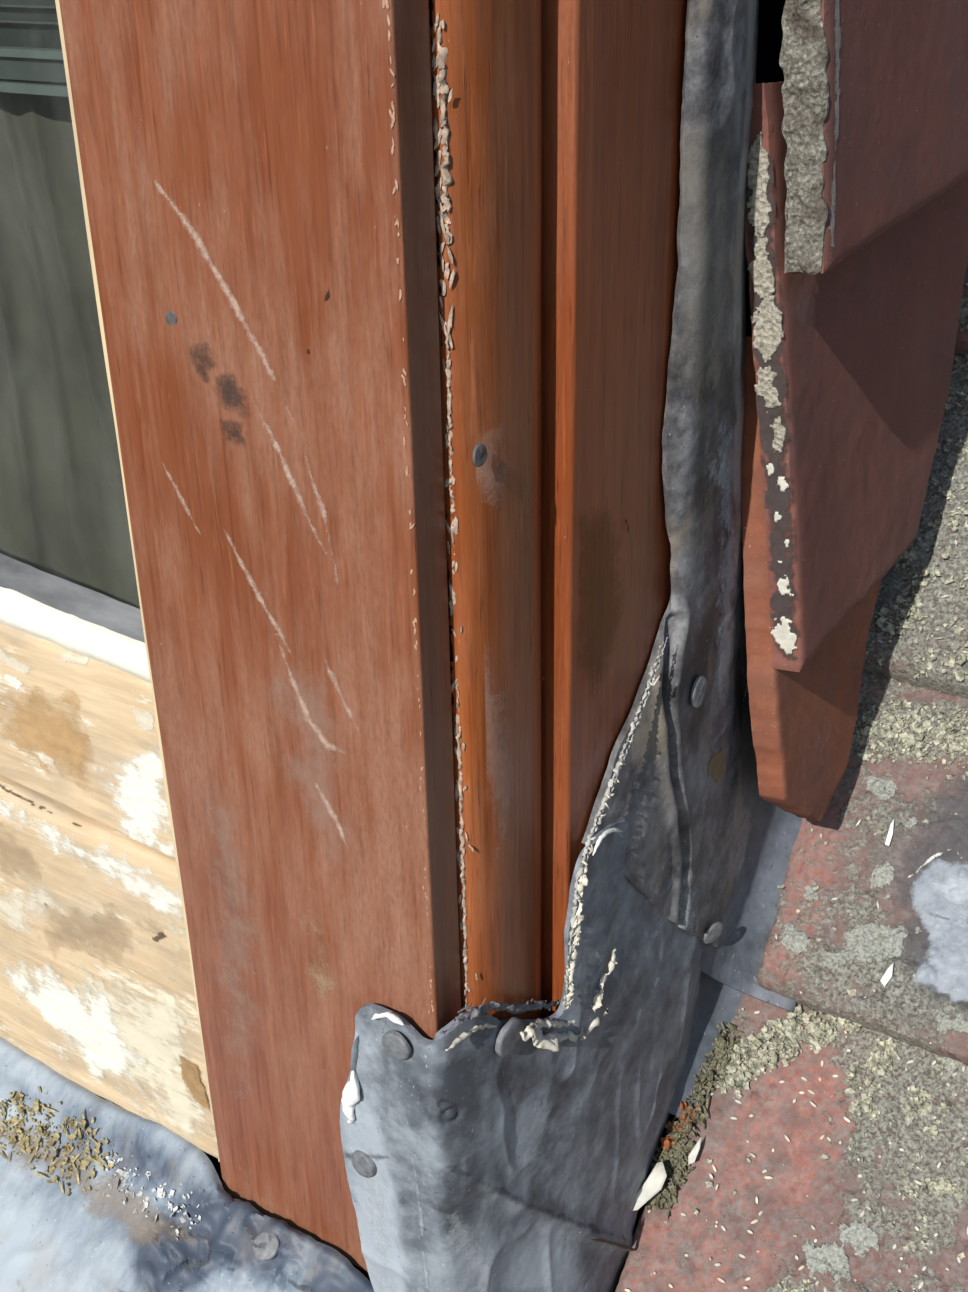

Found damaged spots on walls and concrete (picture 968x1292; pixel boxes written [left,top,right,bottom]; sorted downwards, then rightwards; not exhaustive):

water stain [194,350,241,406]
peeling [0,647,175,857]
peeling [0,797,186,949]
peeling [4,959,209,1137]